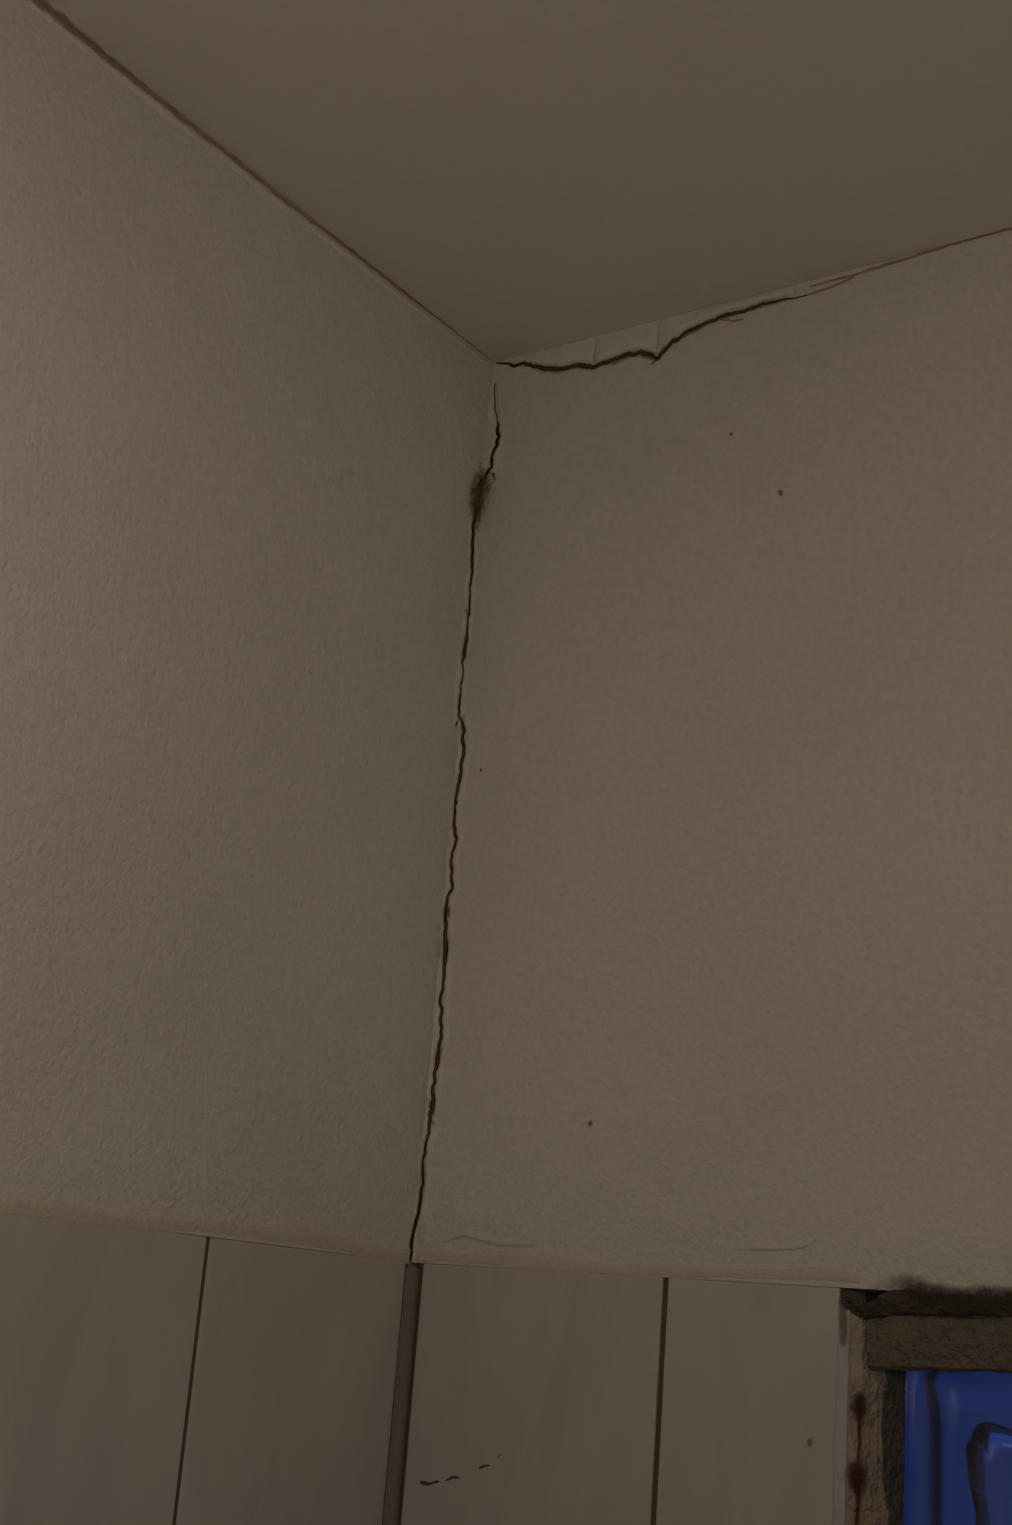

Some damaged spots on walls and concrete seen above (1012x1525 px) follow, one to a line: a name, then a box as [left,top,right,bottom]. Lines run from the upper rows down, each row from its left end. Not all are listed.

crack [21,0,1012,372]
crack [407,383,505,1263]